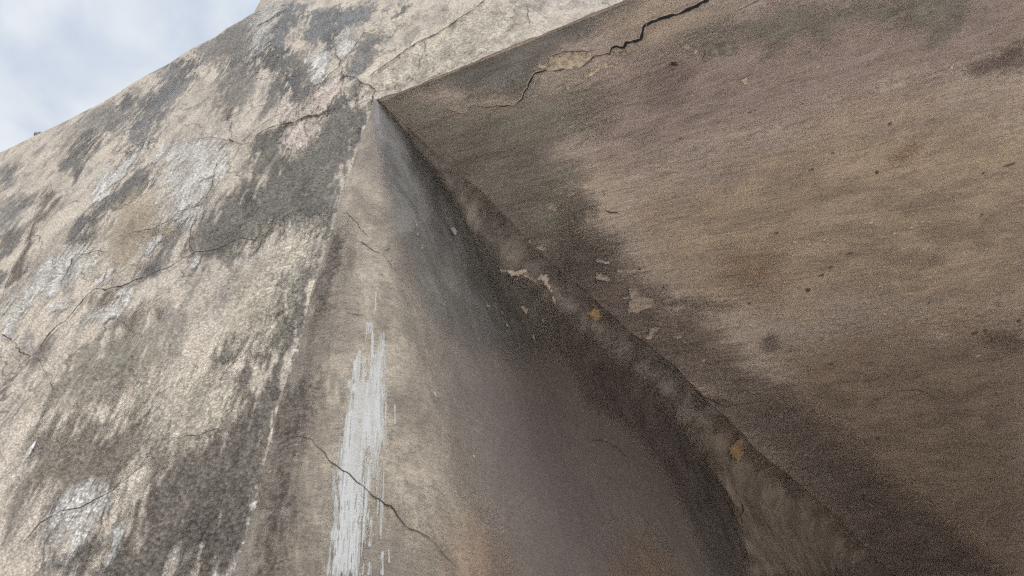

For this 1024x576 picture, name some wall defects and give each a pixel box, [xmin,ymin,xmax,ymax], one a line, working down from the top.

crack [442,0,710,113]
leakage [352,293,376,381]
leakage [382,0,1024,576]
leakage [360,456,390,575]
crack [299,436,455,565]